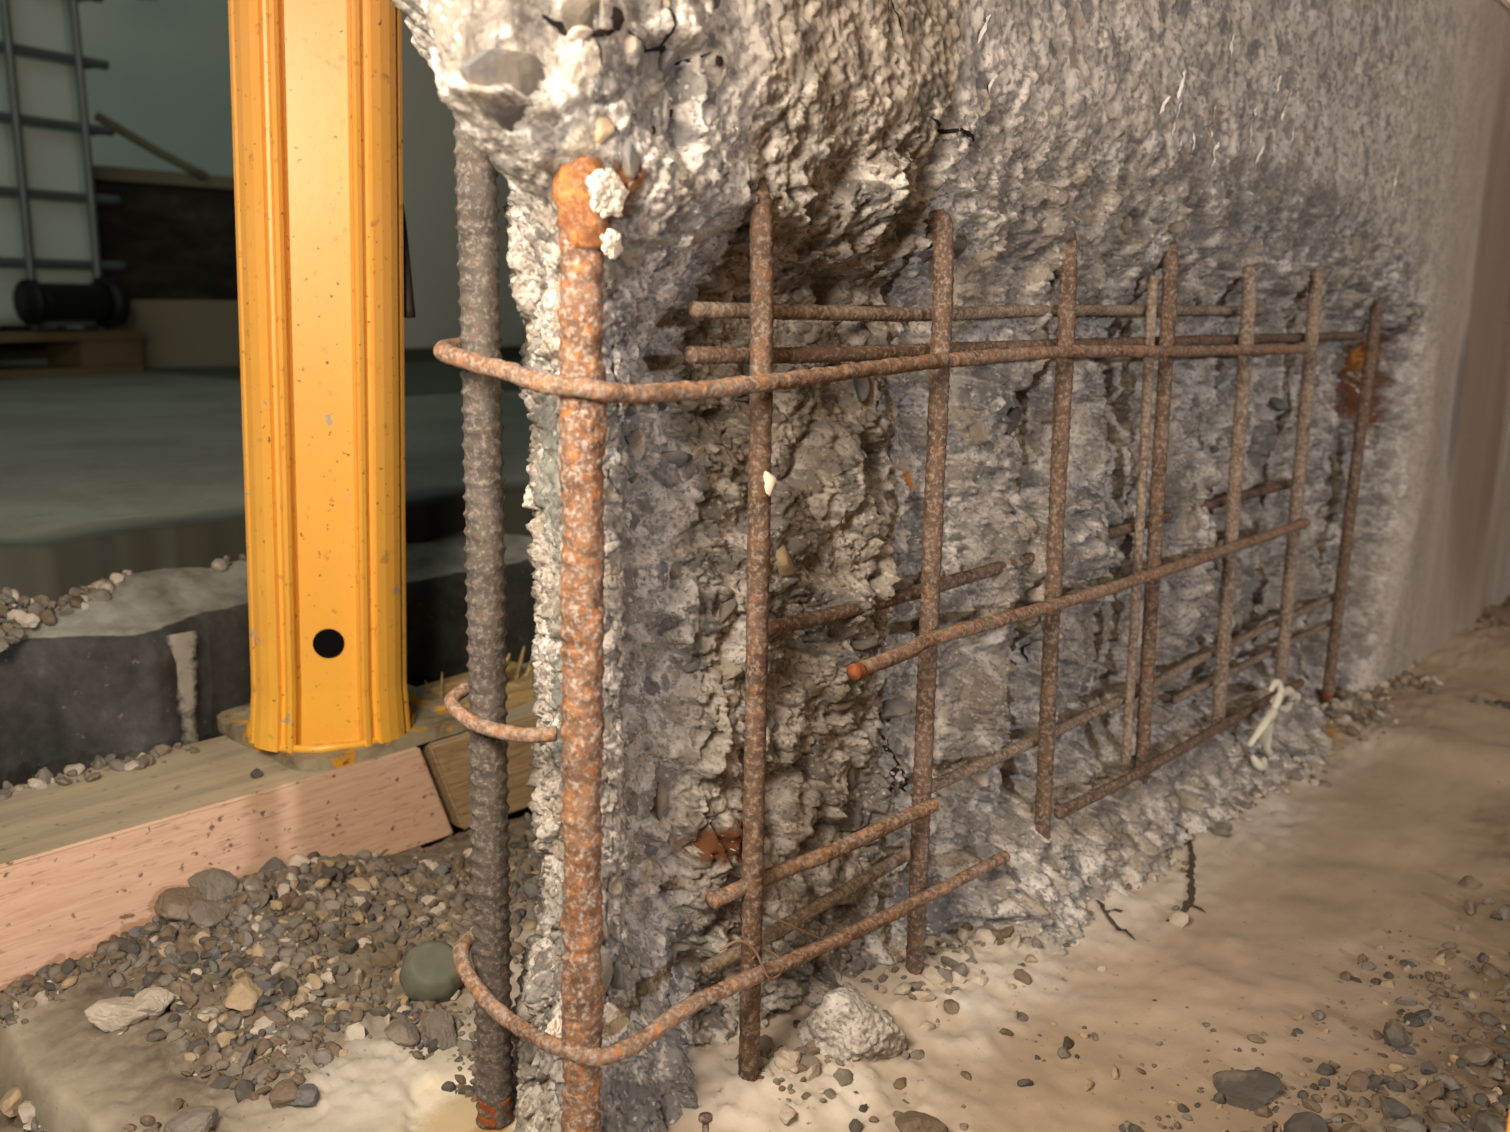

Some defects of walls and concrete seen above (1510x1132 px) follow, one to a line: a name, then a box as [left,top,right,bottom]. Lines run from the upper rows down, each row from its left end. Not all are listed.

corrosion [552,155,646,248]
corrosion [1334,324,1403,427]
spalling [391,0,1430,1132]
corrosion [683,820,743,866]
corrosion [430,1099,501,1132]